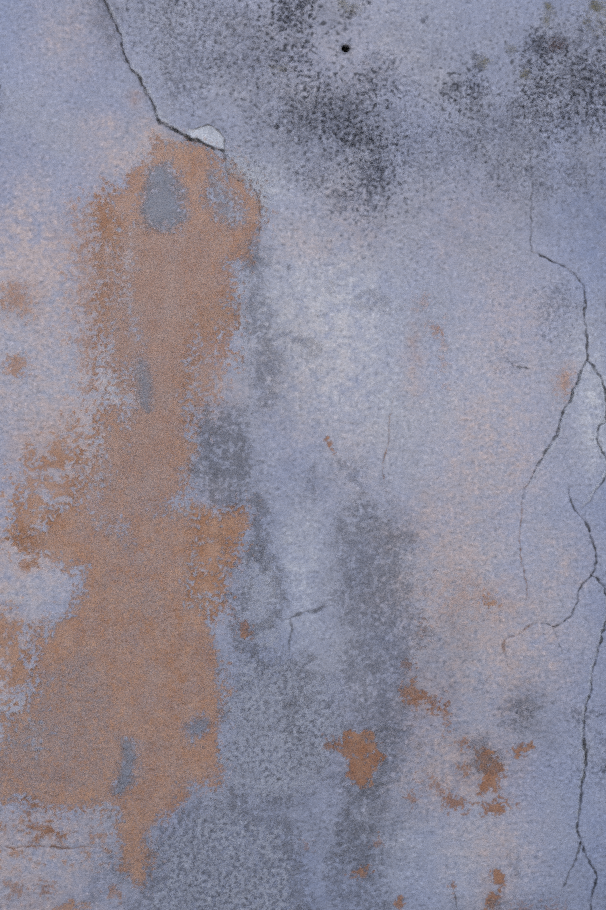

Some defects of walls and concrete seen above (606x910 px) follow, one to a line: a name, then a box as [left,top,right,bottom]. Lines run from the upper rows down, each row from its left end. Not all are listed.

crack [104,0,236,179]
peeling [0,125,268,886]
crack [529,255,606,627]
peeling [325,730,387,788]
peeling [442,737,517,817]
peeling [512,741,535,759]
crack [564,621,606,909]